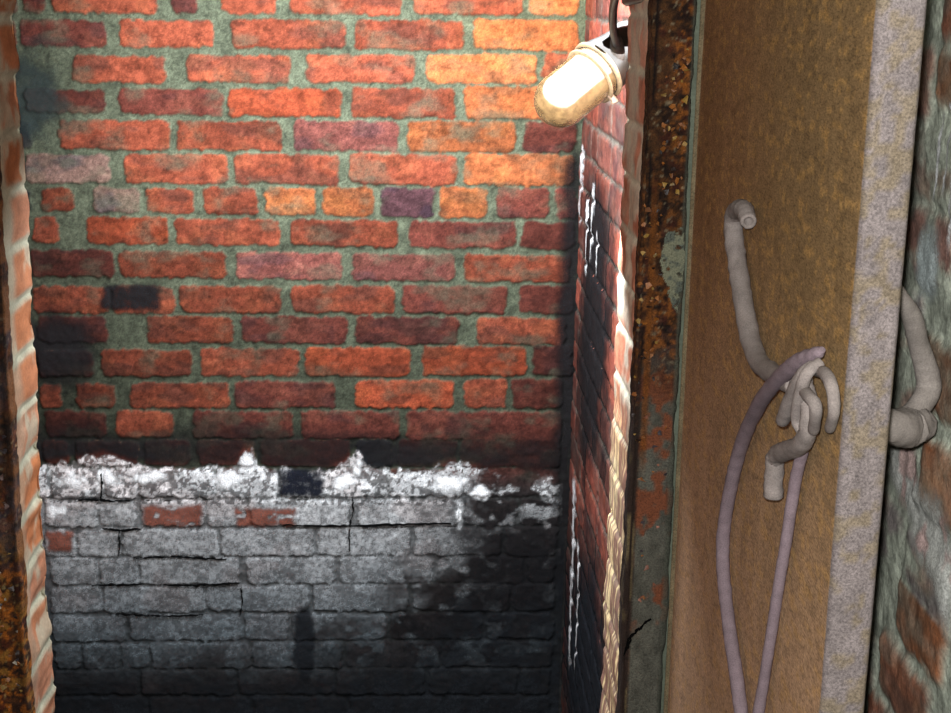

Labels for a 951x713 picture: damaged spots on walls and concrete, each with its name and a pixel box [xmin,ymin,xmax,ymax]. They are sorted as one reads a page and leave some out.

corrosion [646,48,691,195]
corrosion [641,204,662,238]
corrosion [636,251,662,362]
water stain [39,451,604,713]